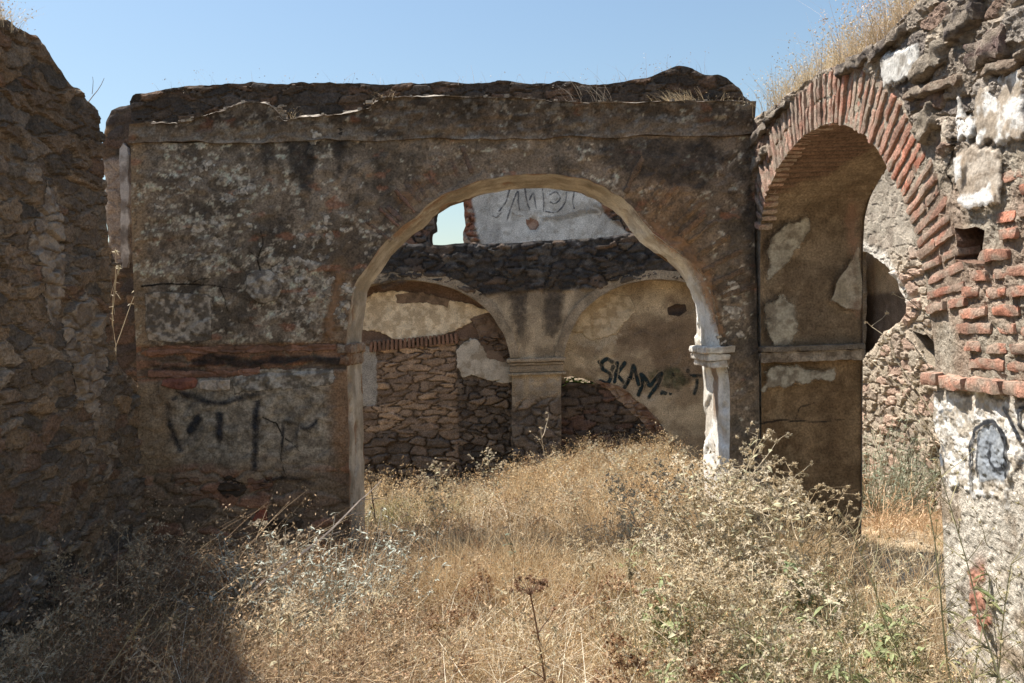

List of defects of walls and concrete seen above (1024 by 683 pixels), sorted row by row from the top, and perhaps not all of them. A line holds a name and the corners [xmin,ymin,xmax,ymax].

peeling [767,218,811,280]
crack [141,278,230,311]
flaking render [470,313,510,362]
leakage [504,272,528,334]
leakage [544,271,564,337]
peeling [764,294,798,346]
peeling [761,364,836,392]